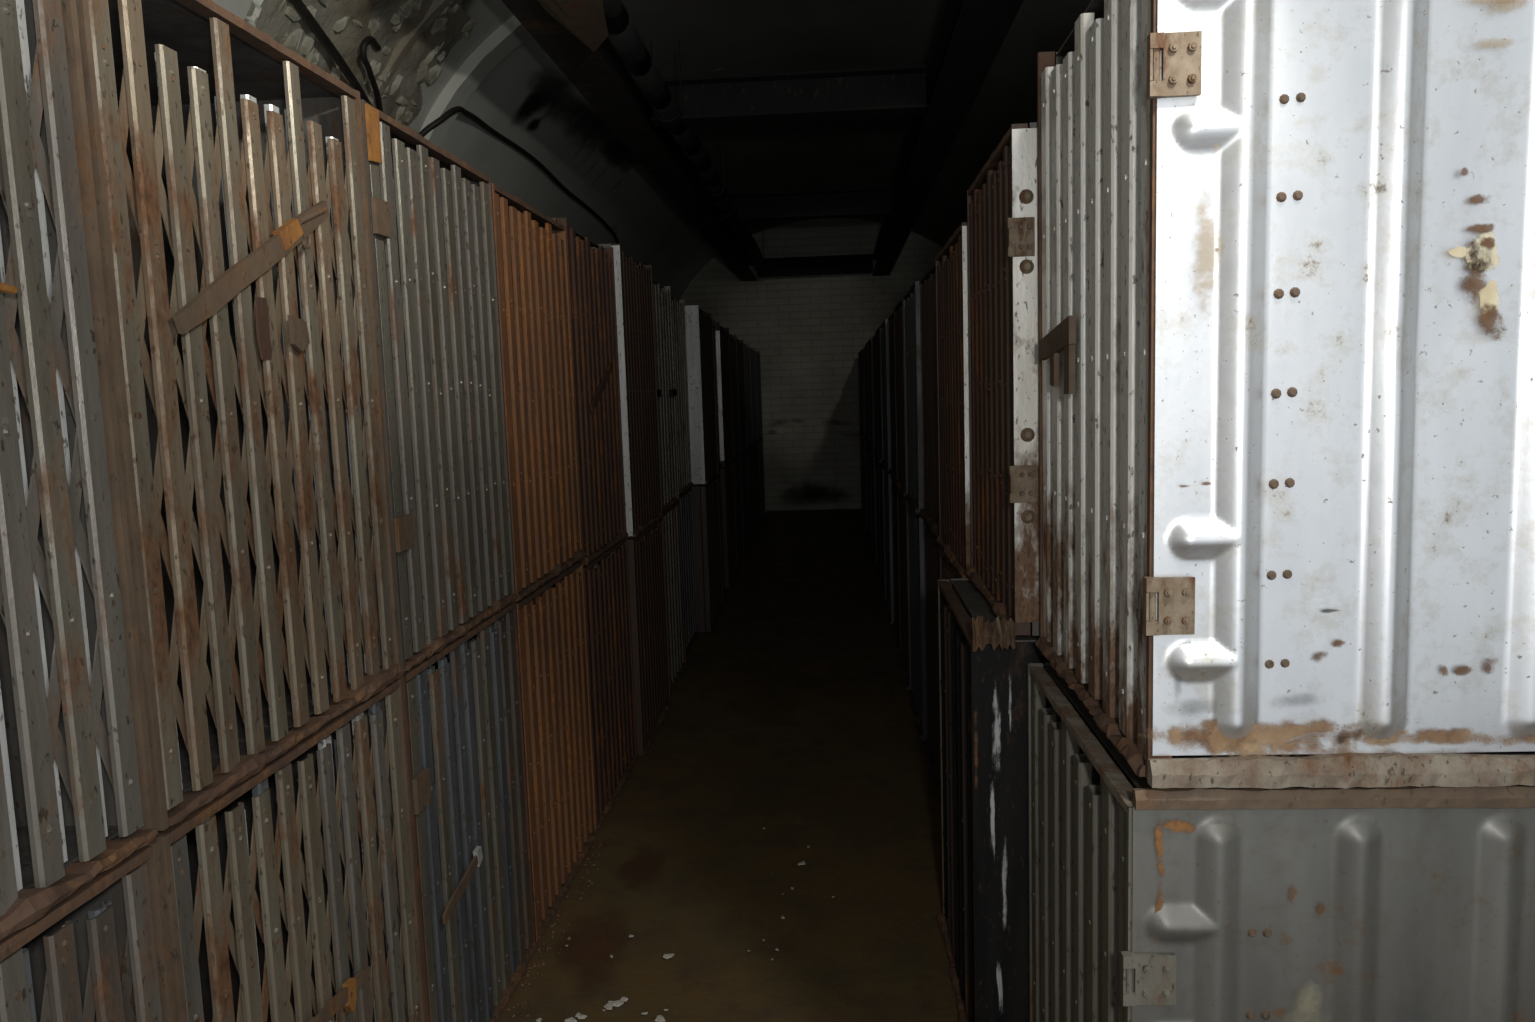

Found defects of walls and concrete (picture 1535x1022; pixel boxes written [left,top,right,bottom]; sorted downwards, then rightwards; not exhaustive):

flaking render [245,0,476,127]